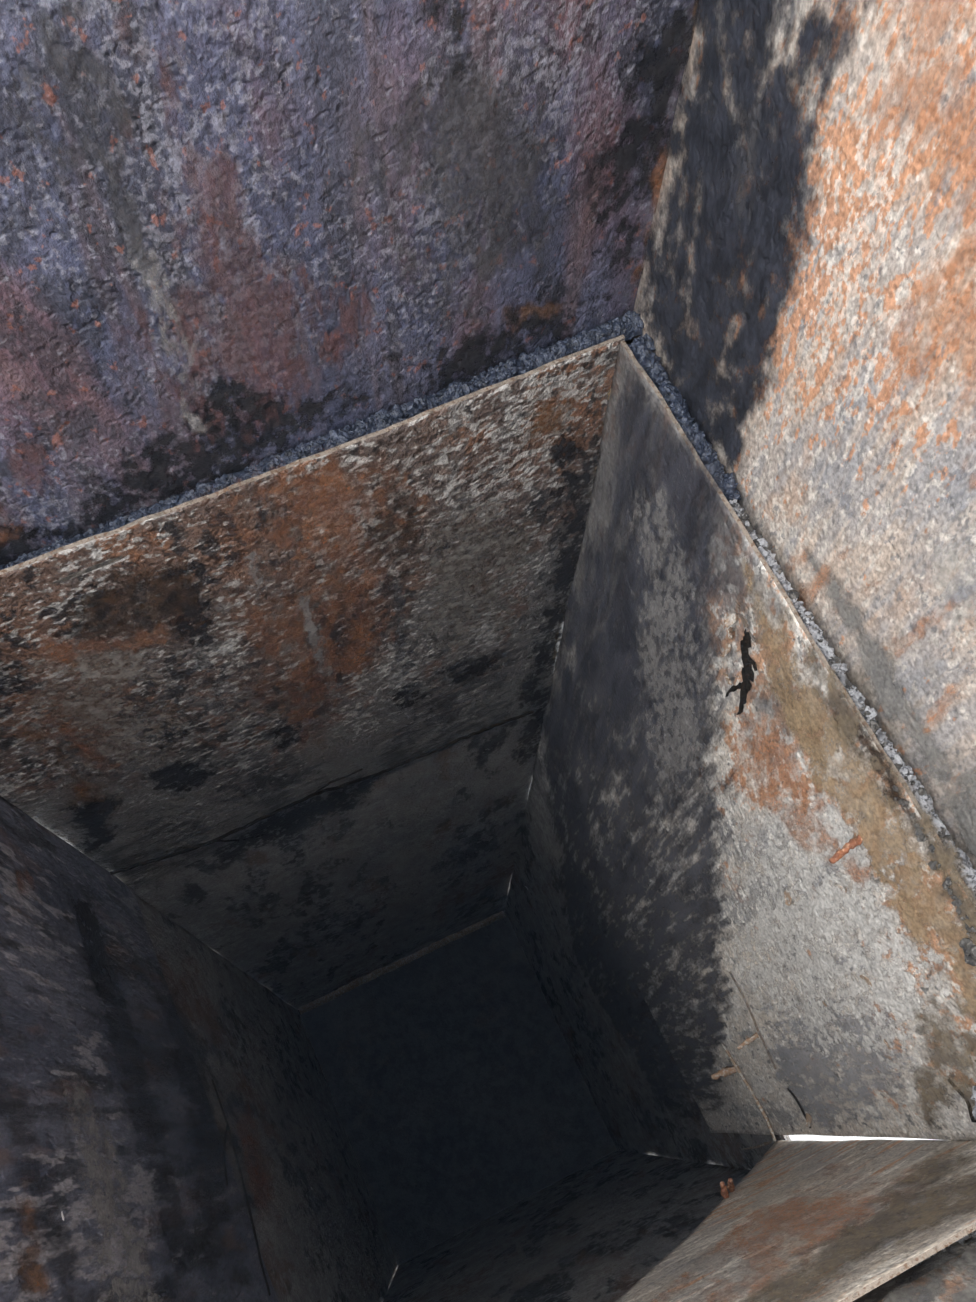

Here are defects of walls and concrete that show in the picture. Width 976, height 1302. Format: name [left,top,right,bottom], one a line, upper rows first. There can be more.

damp [189,376,265,435]
crack [110,710,534,875]
corrosion [757,608,976,1020]